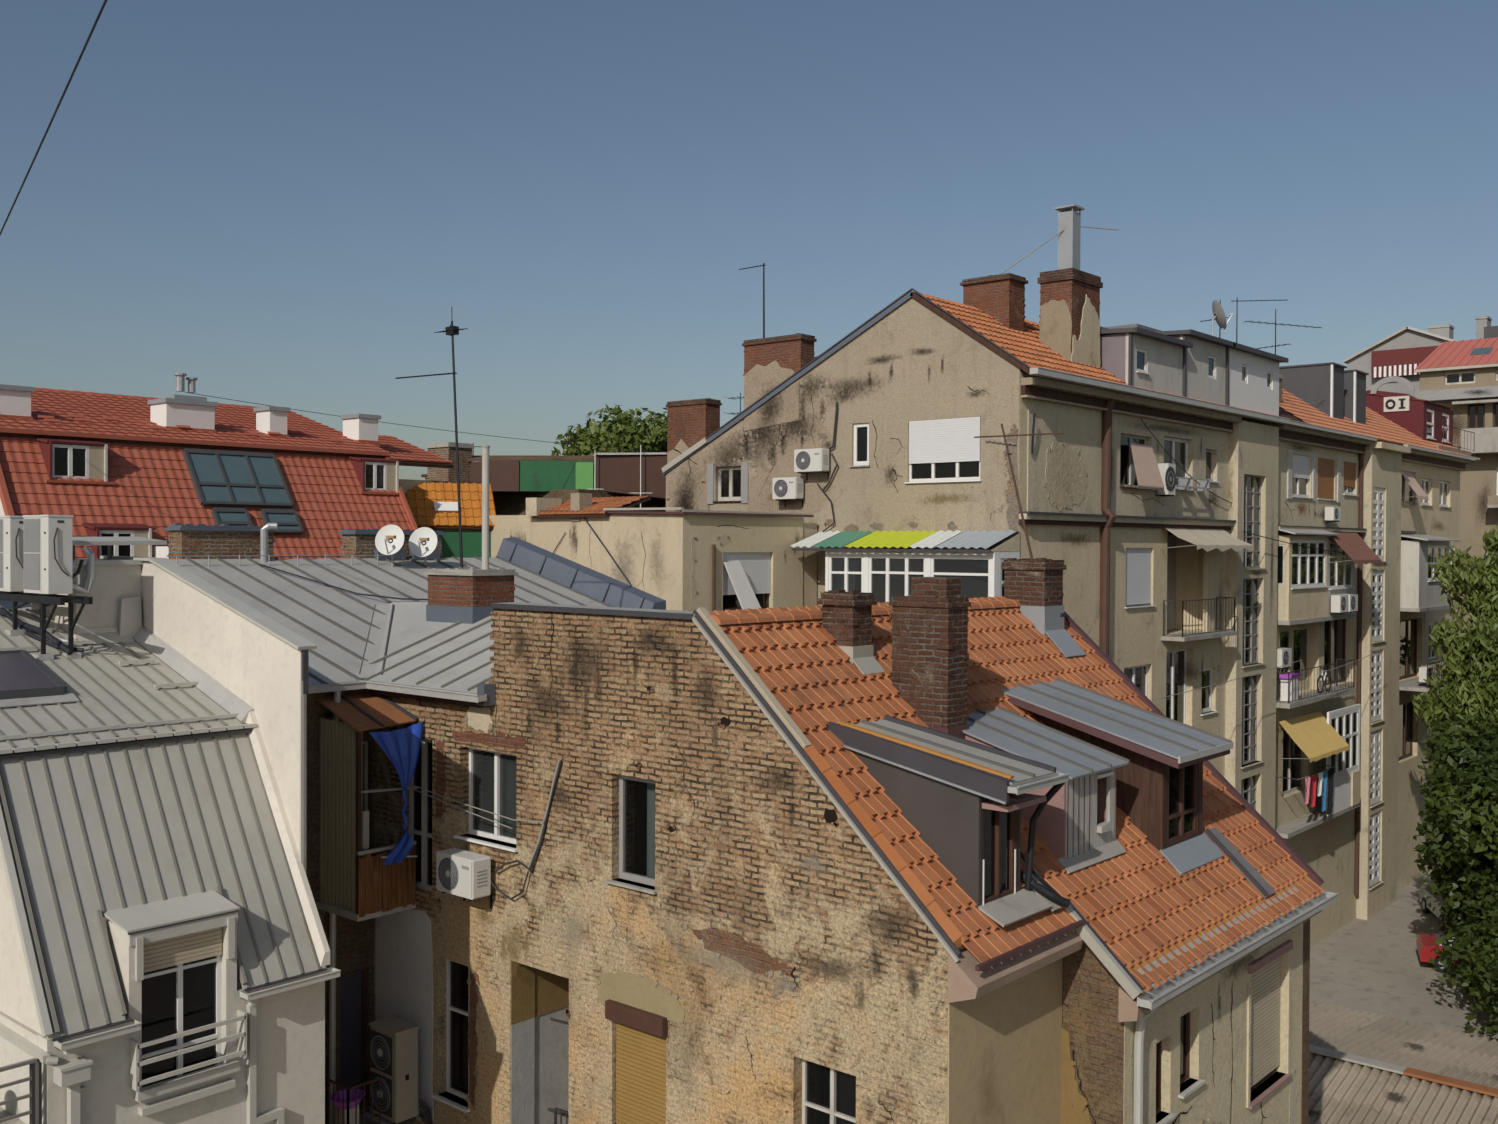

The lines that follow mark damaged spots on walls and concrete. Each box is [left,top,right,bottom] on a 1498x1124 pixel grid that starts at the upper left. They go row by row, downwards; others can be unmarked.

spalling [684,924,798,976]